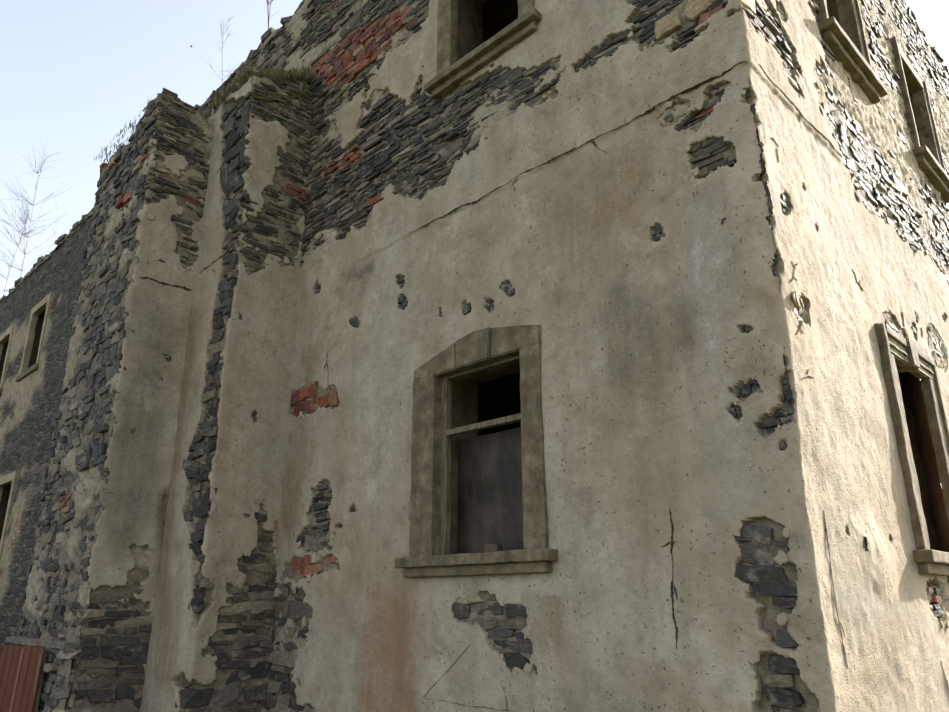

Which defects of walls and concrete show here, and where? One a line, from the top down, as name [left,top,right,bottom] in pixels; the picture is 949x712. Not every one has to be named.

spalling [740,0,802,94]
crack [409,61,843,291]
spalling [780,195,789,214]
spalling [807,0,949,284]
spalling [17,0,737,712]
spalling [728,379,762,419]
spalling [758,376,794,436]
spalling [792,291,808,322]
crack [661,508,679,650]
spalling [730,519,819,712]
crack [823,510,848,669]
spalling [926,576,949,629]